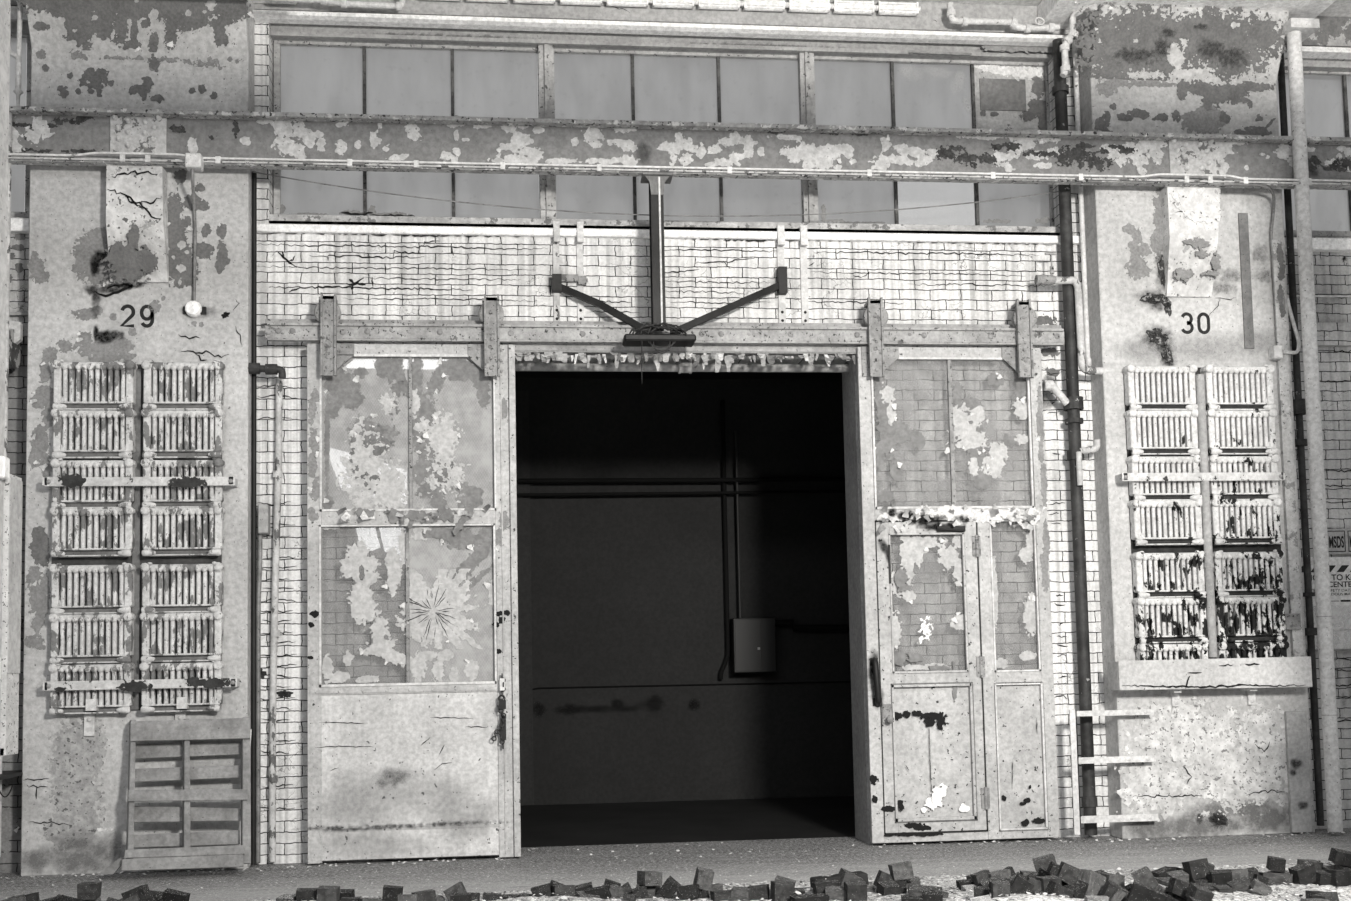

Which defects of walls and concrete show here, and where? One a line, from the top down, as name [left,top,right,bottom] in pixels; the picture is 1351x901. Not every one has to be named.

peeling [12,0,255,104]
peeling [1074,1,1351,178]
peeling [12,115,55,153]
peeling [187,137,198,153]
peeling [256,120,422,161]
peeling [439,114,641,165]
peeling [657,131,939,171]
crack [107,170,161,219]
peeling [1036,314,1063,328]
peeling [307,357,511,684]
peeling [874,346,1063,671]
spalling [895,686,958,731]